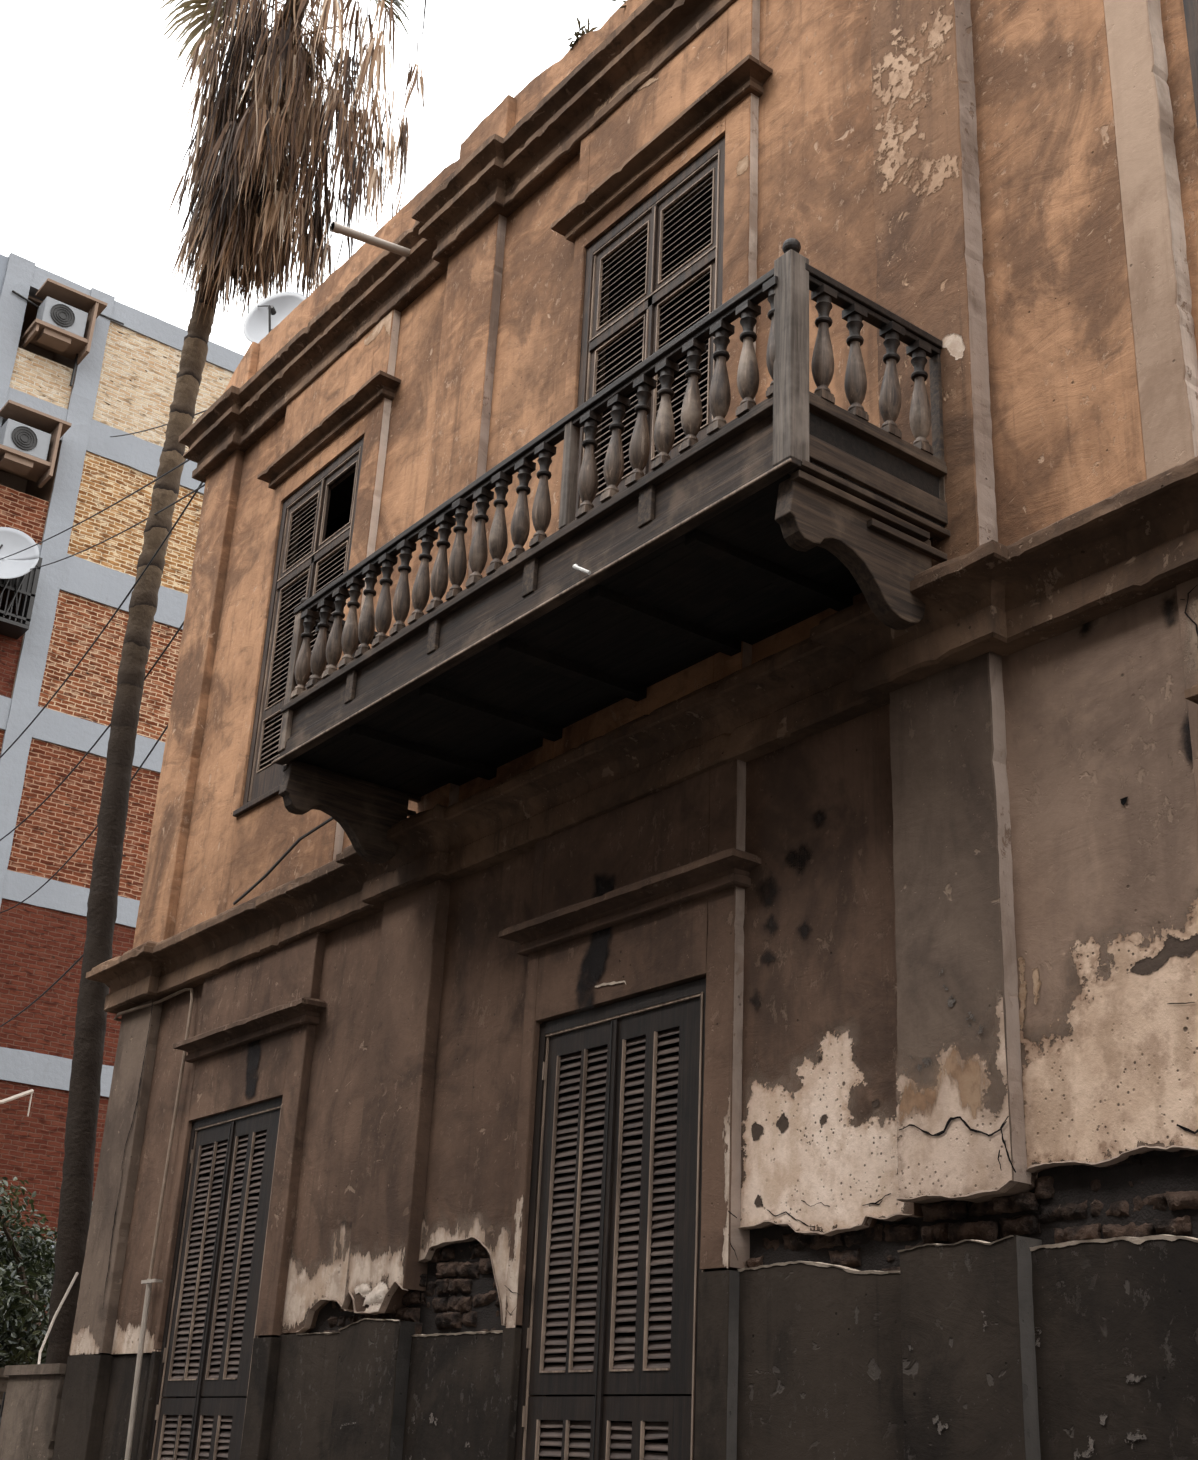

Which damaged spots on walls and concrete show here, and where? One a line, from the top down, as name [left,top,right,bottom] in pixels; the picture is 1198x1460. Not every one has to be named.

peeling [871,5,960,203]
damp [594,875,615,898]
damp [576,927,611,1008]
crack [899,1116,1016,1173]
peeling [722,897,1198,1274]
spalling [282,1194,523,1337]